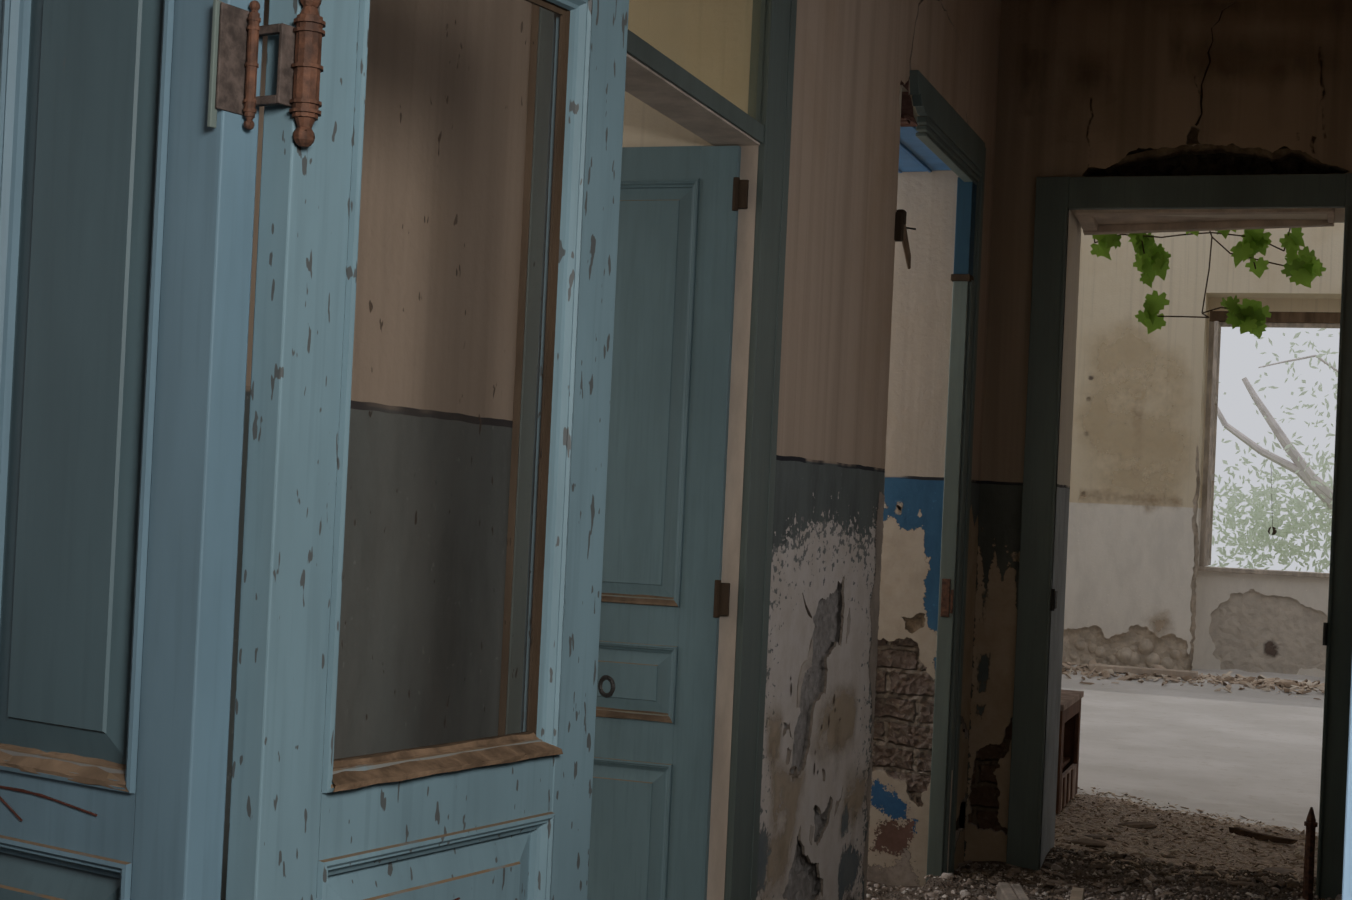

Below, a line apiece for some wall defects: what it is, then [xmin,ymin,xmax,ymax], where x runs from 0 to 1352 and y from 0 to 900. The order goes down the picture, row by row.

crack [1195,0,1236,126]
flaking render [1082,126,1349,177]
peeling [756,478,937,900]
peeling [964,528,1020,862]
flaking render [1062,625,1193,671]
flaking render [1209,589,1328,675]